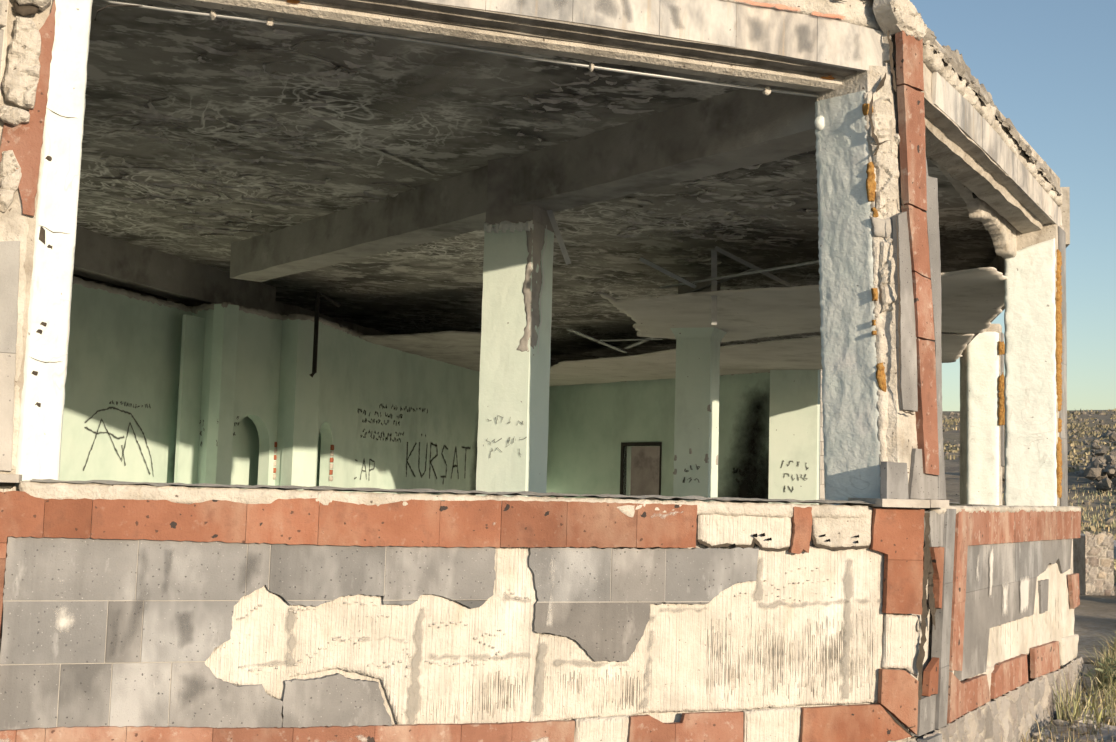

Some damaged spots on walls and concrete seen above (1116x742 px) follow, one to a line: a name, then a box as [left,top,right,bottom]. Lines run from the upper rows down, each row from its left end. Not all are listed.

spalling [0,0,75,126]
spalling [873,0,928,41]
spalling [0,150,22,213]
peeling [39,226,70,249]
spalling [484,219,547,352]
spalling [617,505,635,517]
spalling [205,508,920,742]
spalling [965,563,1079,701]